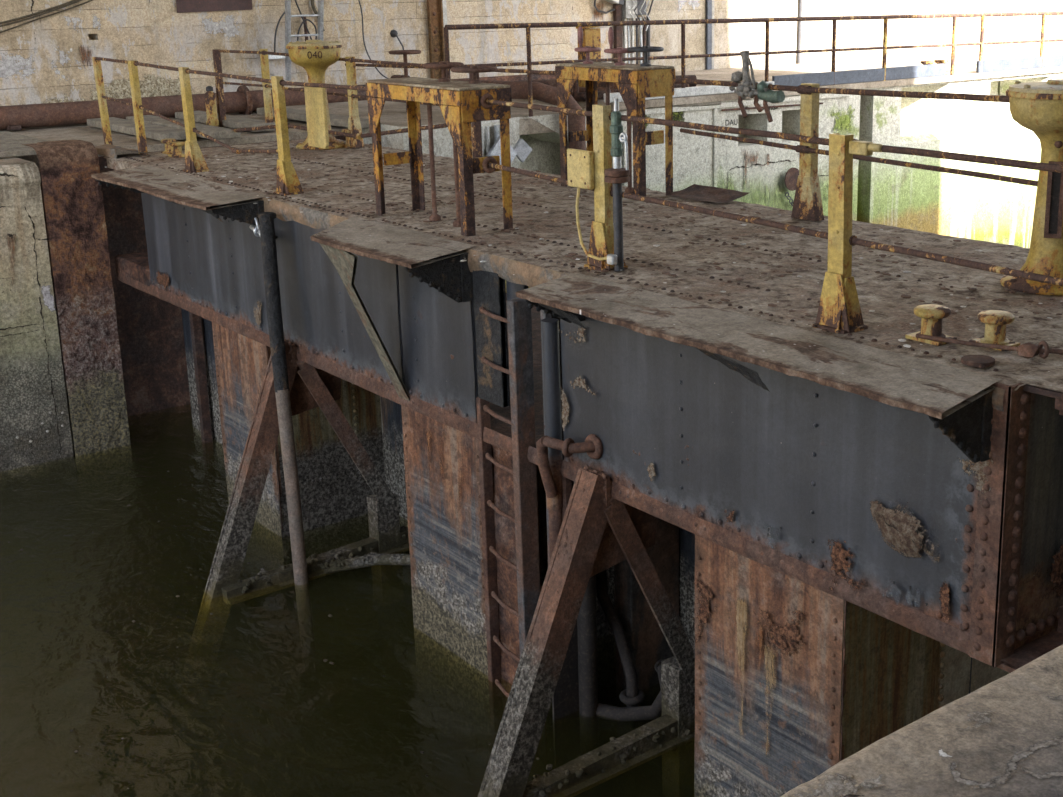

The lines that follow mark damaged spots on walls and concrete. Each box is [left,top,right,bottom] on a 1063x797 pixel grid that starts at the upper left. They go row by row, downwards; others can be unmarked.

corrosion [870,500,940,562]
corrosion [736,598,805,702]
crack [950,736,1063,789]